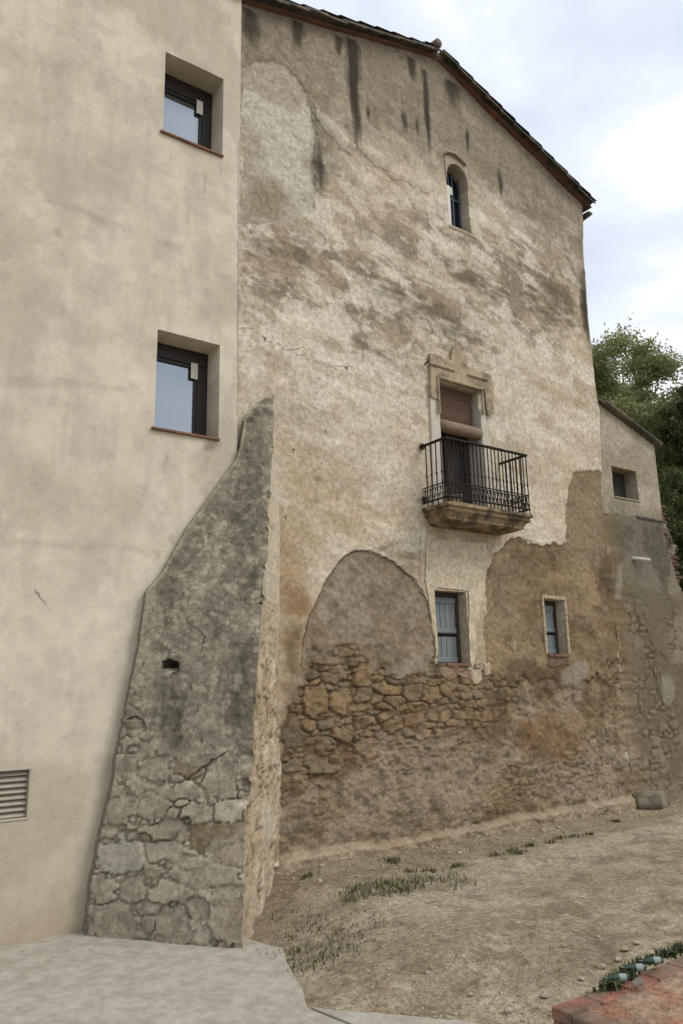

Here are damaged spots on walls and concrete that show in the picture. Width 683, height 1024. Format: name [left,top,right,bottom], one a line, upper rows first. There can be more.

leakage [293,20,303,44]
leakage [336,35,370,130]
leakage [402,56,430,135]
leakage [315,153,325,185]
flaking render [274,470,638,878]
crack [187,750,229,787]